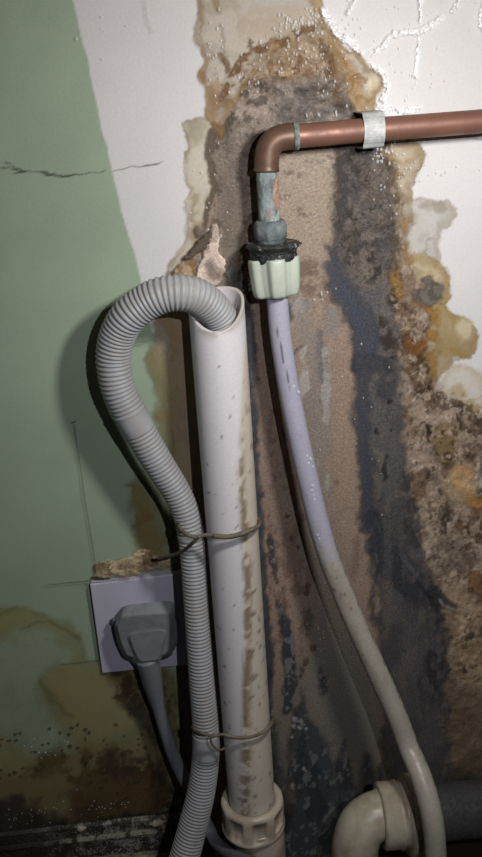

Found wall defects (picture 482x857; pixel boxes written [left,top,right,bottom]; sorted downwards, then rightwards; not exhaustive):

crack [7,162,77,177]
leakage [167,0,421,275]
spalling [92,513,181,580]
leakage [146,310,203,512]
flaking render [172,36,387,849]
leakage [325,140,482,783]
flaking render [380,142,482,781]
leakage [0,607,183,831]
leakage [161,667,188,769]
flaking render [200,836,222,857]
flaking render [378,845,425,857]
flaking render [446,838,482,857]